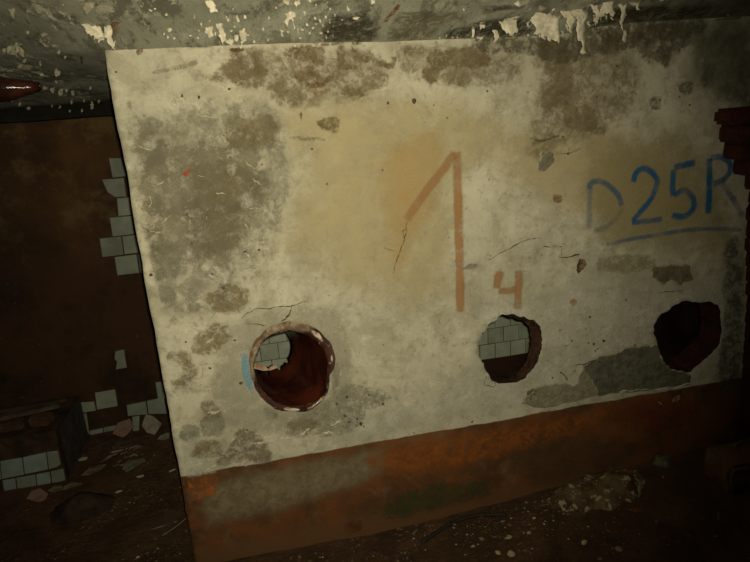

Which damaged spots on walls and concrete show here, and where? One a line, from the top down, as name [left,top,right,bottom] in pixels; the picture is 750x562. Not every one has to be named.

peeling [82,21,127,50]
peeling [189,0,256,52]
peeling [275,0,343,47]
peeling [389,9,520,42]
peeling [526,1,640,55]
damp [210,6,750,296]
damp [133,106,284,312]
crack [242,301,305,326]
damp [167,324,229,386]
flaking render [521,335,691,408]
damp [179,402,272,464]